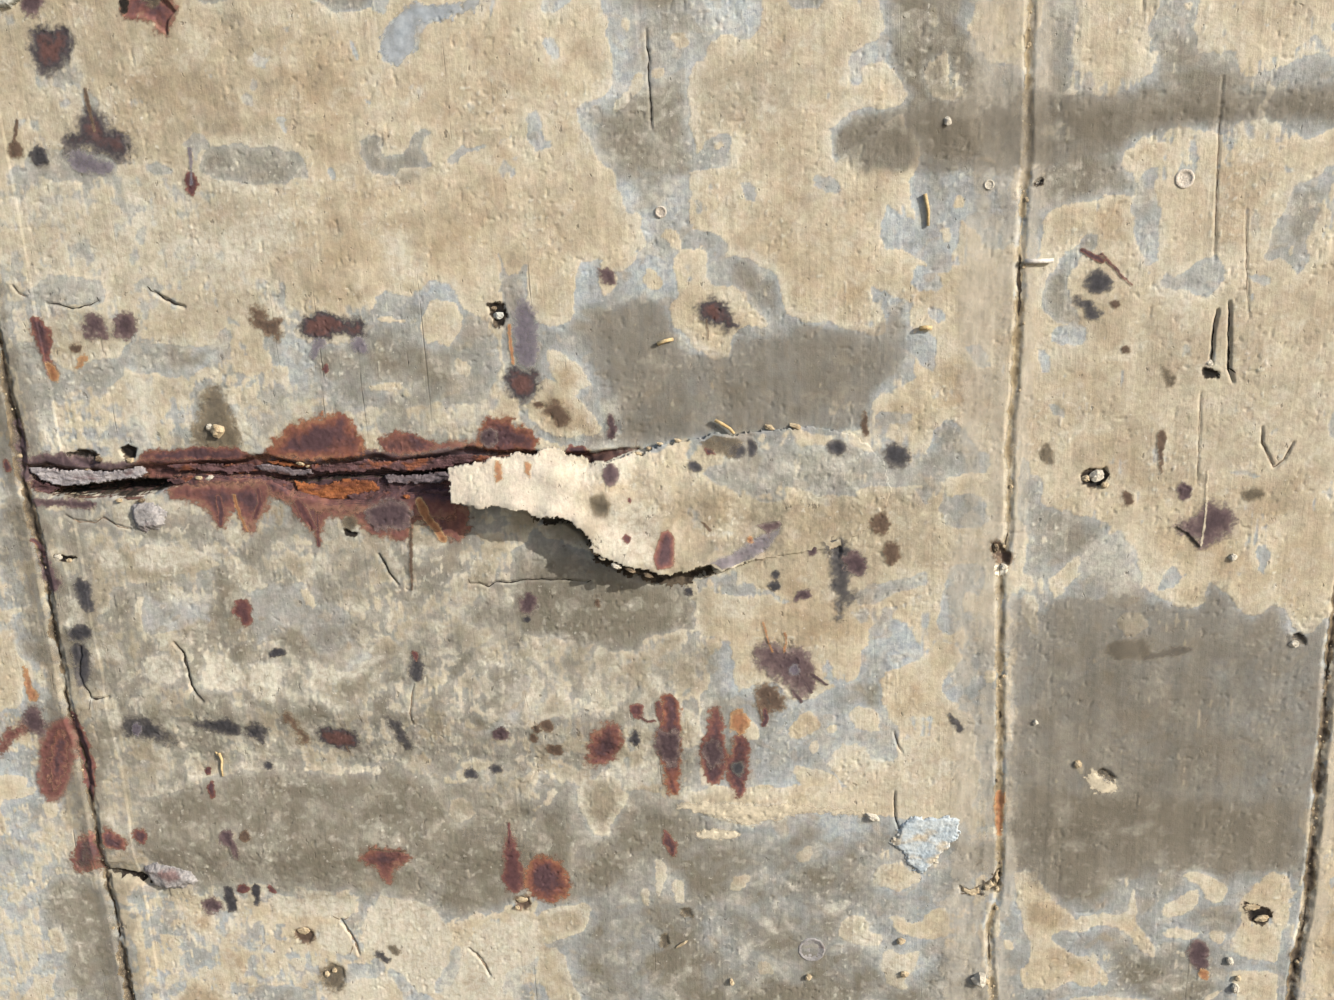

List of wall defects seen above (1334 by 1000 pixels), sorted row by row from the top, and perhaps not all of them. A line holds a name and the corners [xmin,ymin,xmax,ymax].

crack [15,288,98,309]
rust [168,480,271,533]
crack [27,438,639,529]
rust [266,411,435,462]
peeling [448,423,892,578]
rust [1175,470,1239,550]
crack [1261,427,1292,468]
damp [1106,640,1192,661]
rust [0,666,97,802]
rust [584,693,683,796]
rust [699,622,829,799]
crack [105,864,159,887]